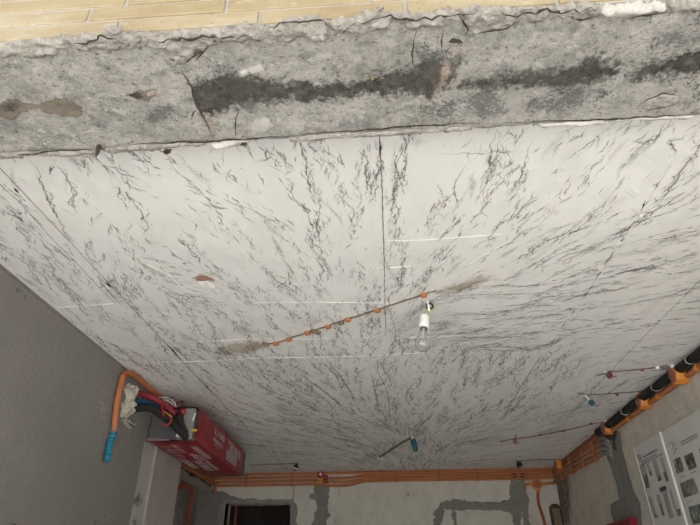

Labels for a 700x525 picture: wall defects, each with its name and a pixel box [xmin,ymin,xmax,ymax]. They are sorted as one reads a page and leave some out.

spalling [0,0,700,64]
leakage [0,97,82,119]
spalling [129,89,156,101]
crack [4,41,468,157]
leakage [187,23,700,124]
crack [486,114,693,124]